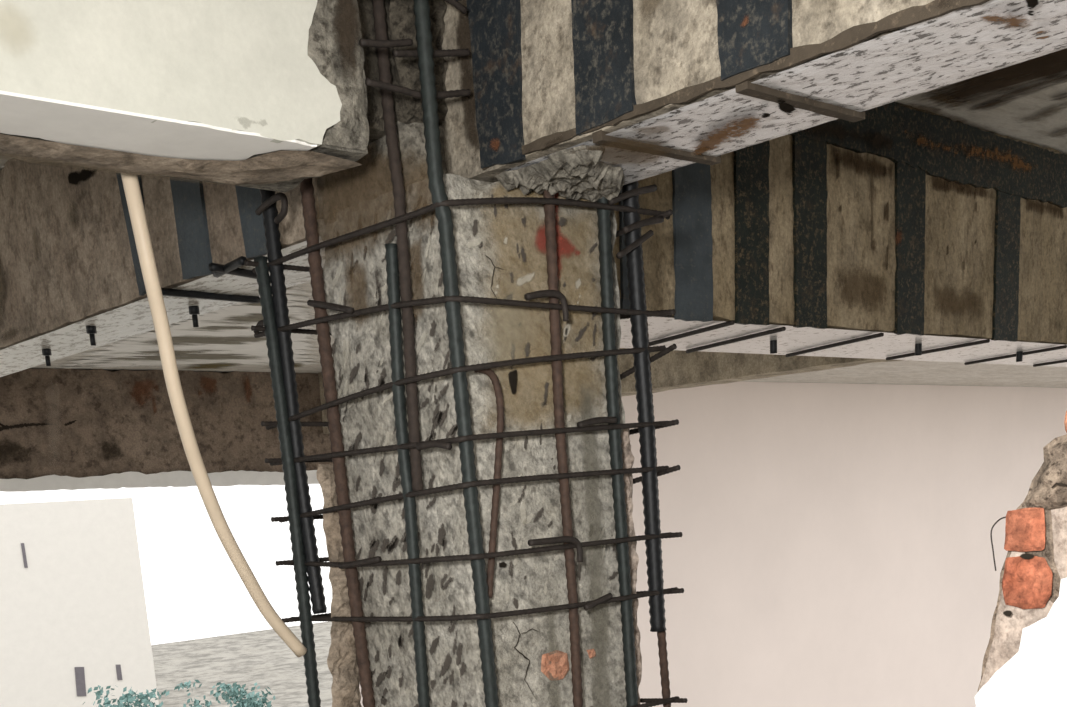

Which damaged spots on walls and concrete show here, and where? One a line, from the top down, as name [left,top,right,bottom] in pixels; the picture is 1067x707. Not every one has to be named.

spalling [389,0,423,120]
spalling [428,0,448,121]
rust [693,117,760,155]
spalling [494,145,624,202]
crack [0,420,77,431]
flaking render [0,471,197,492]
flaking render [207,470,285,486]
spalling [1022,439,1067,510]
spalling [306,464,362,707]
spalling [621,423,642,705]
spalling [541,650,569,680]
flaking render [979,591,1054,690]